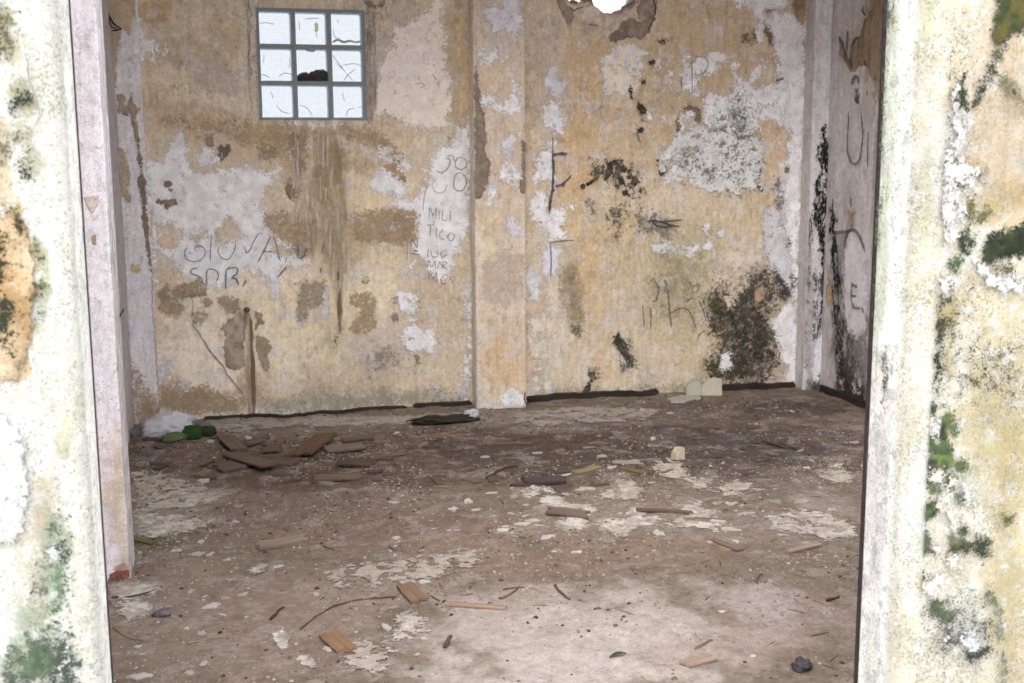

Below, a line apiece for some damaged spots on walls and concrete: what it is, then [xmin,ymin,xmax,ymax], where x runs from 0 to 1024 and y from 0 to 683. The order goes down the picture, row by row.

peeling [0,217,36,383]
peeling [109,0,311,300]
peeling [270,404,364,415]
peeling [367,0,577,409]
peeling [557,0,807,383]
damp [669,87,864,400]